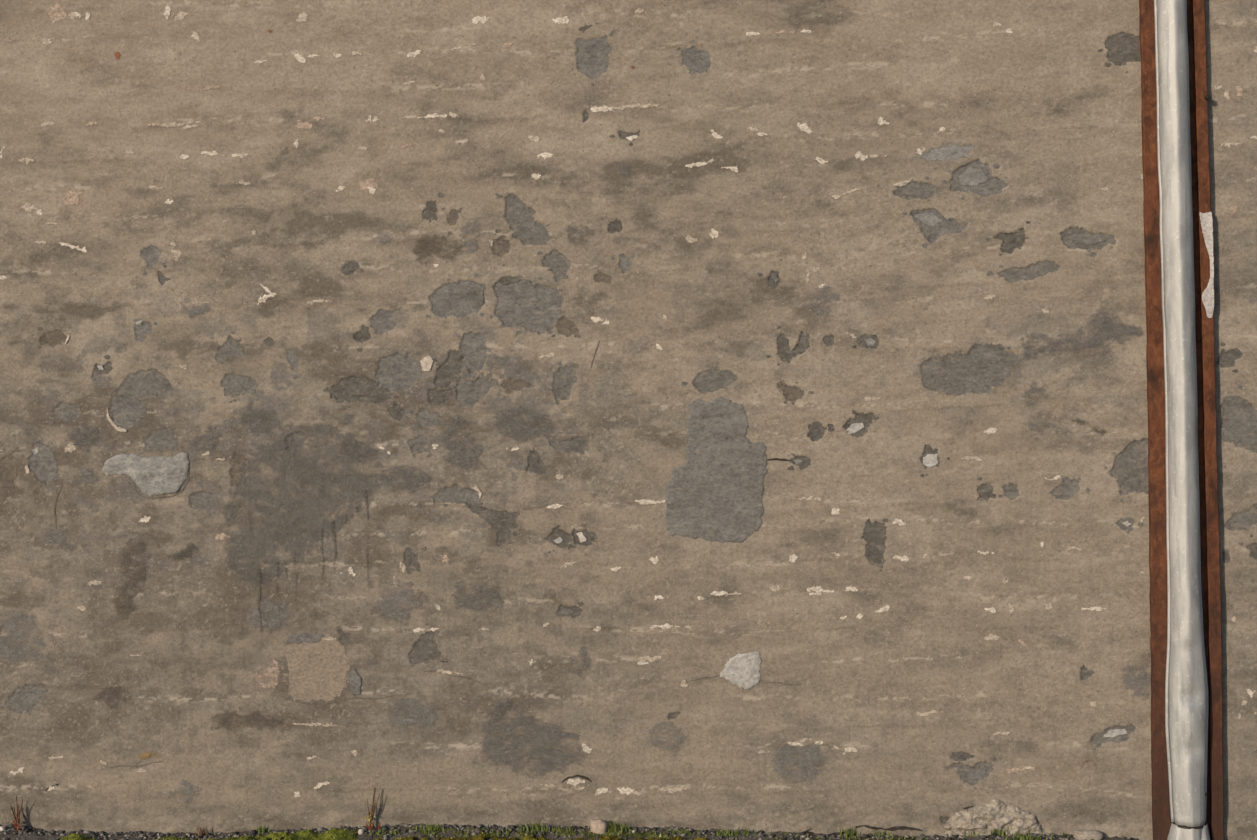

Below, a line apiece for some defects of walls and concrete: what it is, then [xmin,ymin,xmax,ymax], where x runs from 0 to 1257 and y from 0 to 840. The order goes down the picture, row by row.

spalling [552,15,615,86]
spalling [893,127,1008,248]
spalling [342,262,360,275]
spalling [421,192,580,338]
spalling [92,355,113,381]
spalling [106,368,173,432]
spalling [322,307,577,421]
spalling [917,343,1021,396]
spalling [1217,342,1257,453]
damp [225,403,430,630]
spalling [861,518,927,571]